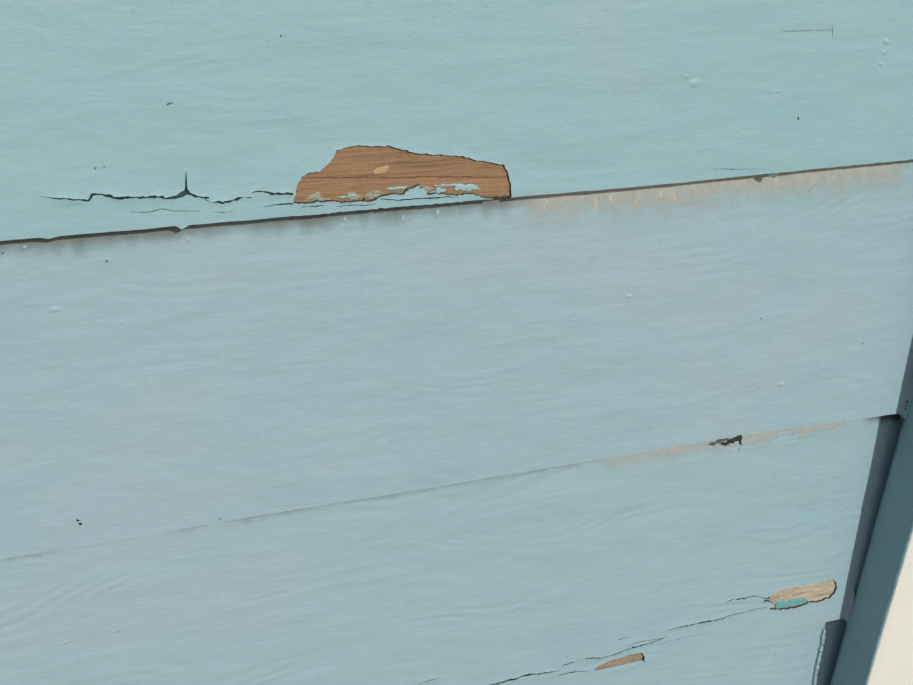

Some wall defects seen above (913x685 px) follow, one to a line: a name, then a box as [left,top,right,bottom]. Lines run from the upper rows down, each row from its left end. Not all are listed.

peeling [292,145,512,204]
crack [41,175,452,213]
peeling [764,580,837,610]
crack [489,596,770,685]
peeling [594,653,645,671]